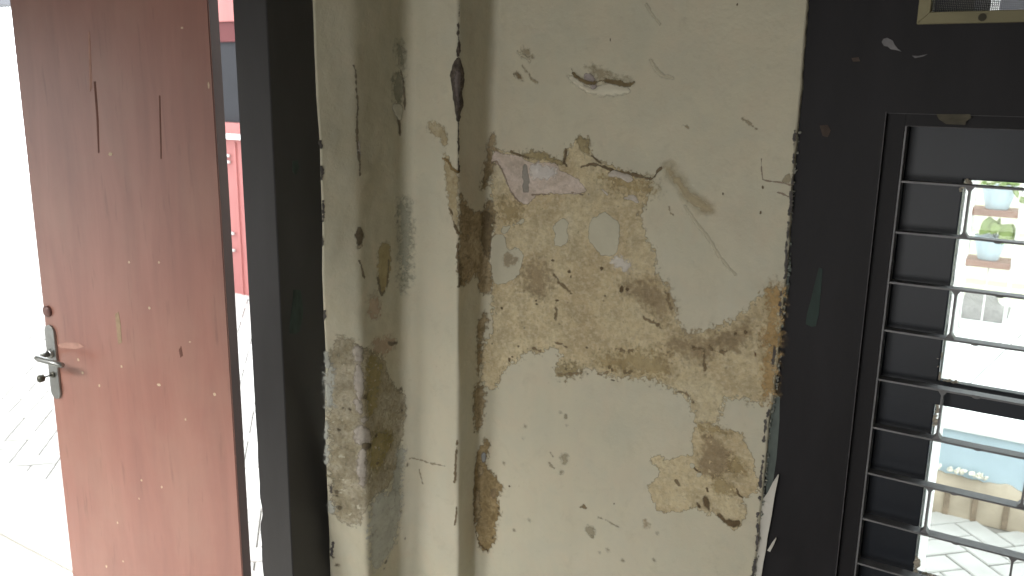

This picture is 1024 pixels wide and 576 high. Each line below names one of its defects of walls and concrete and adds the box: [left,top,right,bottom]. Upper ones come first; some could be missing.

spalling [450,57,465,122]
spalling [568,66,635,96]
peeling [324,335,408,526]
peeling [481,136,783,576]